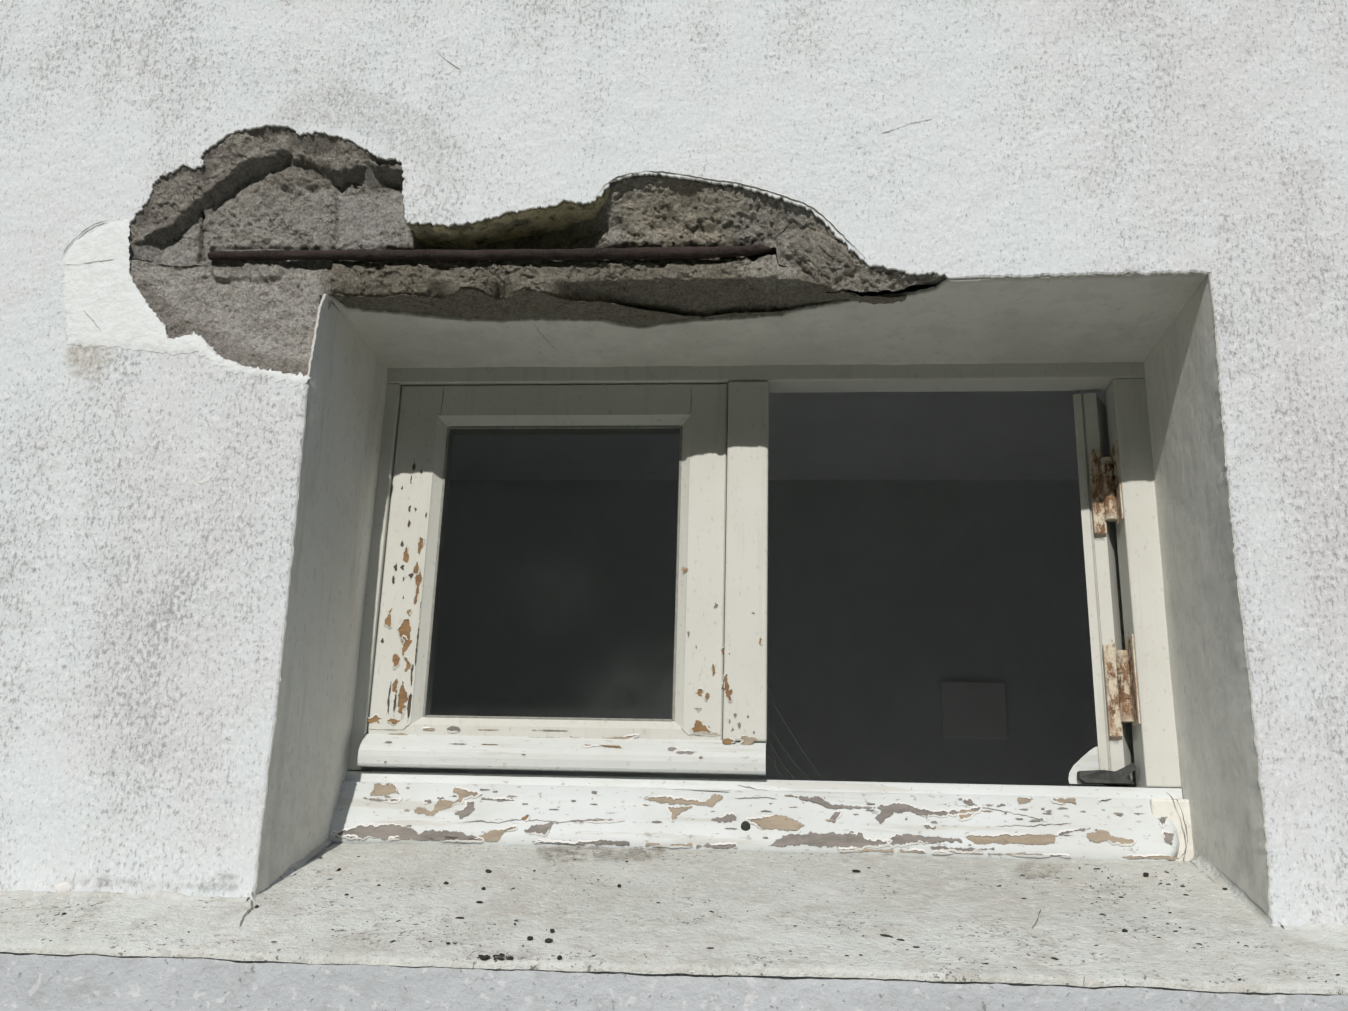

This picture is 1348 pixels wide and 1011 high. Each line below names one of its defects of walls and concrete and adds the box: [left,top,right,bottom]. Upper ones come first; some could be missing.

spalling [63,127,945,389]
peeling [367,505,464,745]
peeling [539,730,640,748]
peeling [668,645,757,758]
peeling [329,781,1179,860]